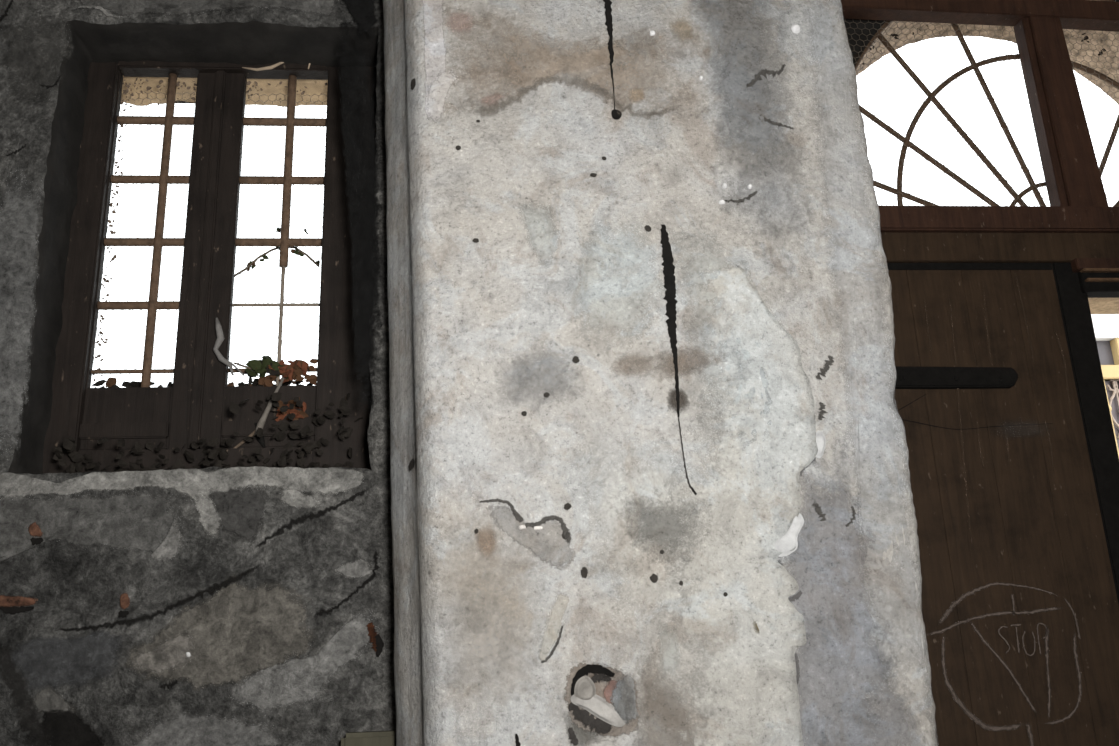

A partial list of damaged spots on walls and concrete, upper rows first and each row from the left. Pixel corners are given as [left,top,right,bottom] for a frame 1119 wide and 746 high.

crack [603,0,622,120]
crack [660,225,697,495]
crack [60,490,366,631]
crack [316,552,380,617]
peeling [480,499,588,578]
peeling [650,265,826,746]
crack [160,680,178,690]
spalling [564,663,640,746]